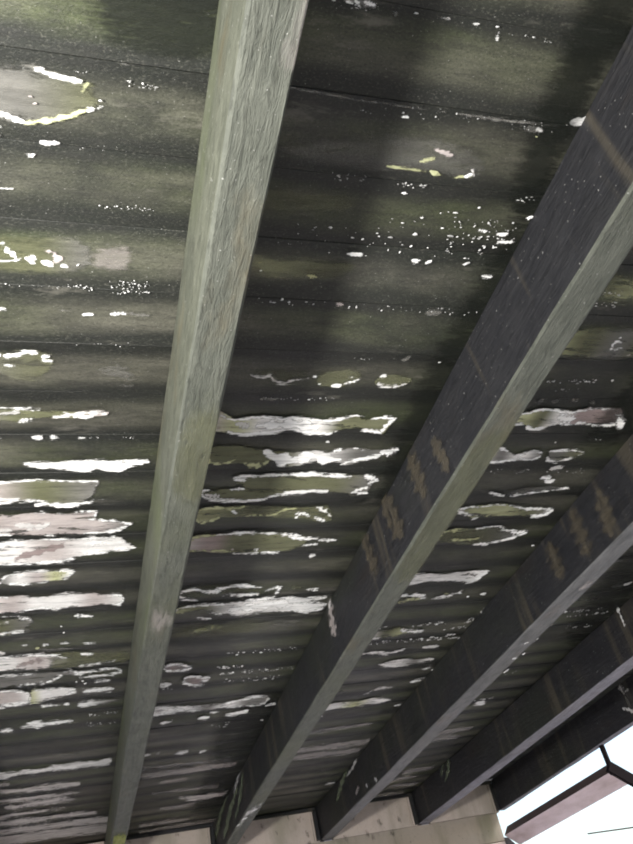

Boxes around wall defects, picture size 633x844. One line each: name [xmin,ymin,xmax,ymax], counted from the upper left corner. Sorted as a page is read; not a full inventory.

water stain [98,0,219,58]
peeling [0,66,103,125]
water stain [381,0,633,499]
peeling [514,407,625,431]
peeling [196,412,399,524]
peeling [439,442,584,546]
peeling [0,459,149,636]
peeling [176,584,327,620]
peeling [189,531,336,558]
peeling [399,570,488,604]
peeling [0,626,130,726]
peeling [0,758,112,844]